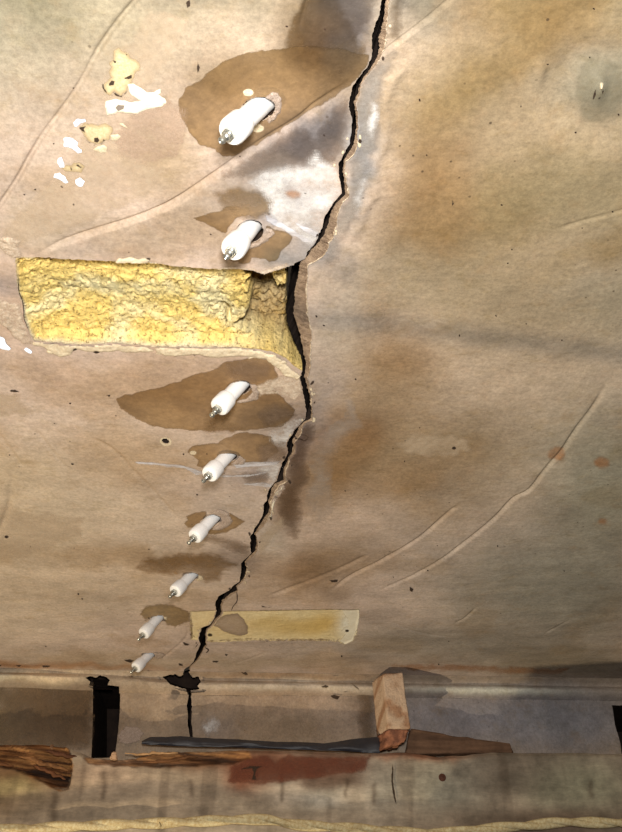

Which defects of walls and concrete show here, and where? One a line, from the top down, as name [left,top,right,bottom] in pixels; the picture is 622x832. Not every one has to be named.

peeling [54,158,85,188]
spalling [64,48,166,153]
leakage [179,0,381,264]
spalling [0,237,302,379]
leakage [117,358,310,532]
spalling [237,384,259,403]
crack [187,0,391,737]
leakage [138,554,235,580]
leakage [208,513,246,551]
spalling [86,675,113,690]